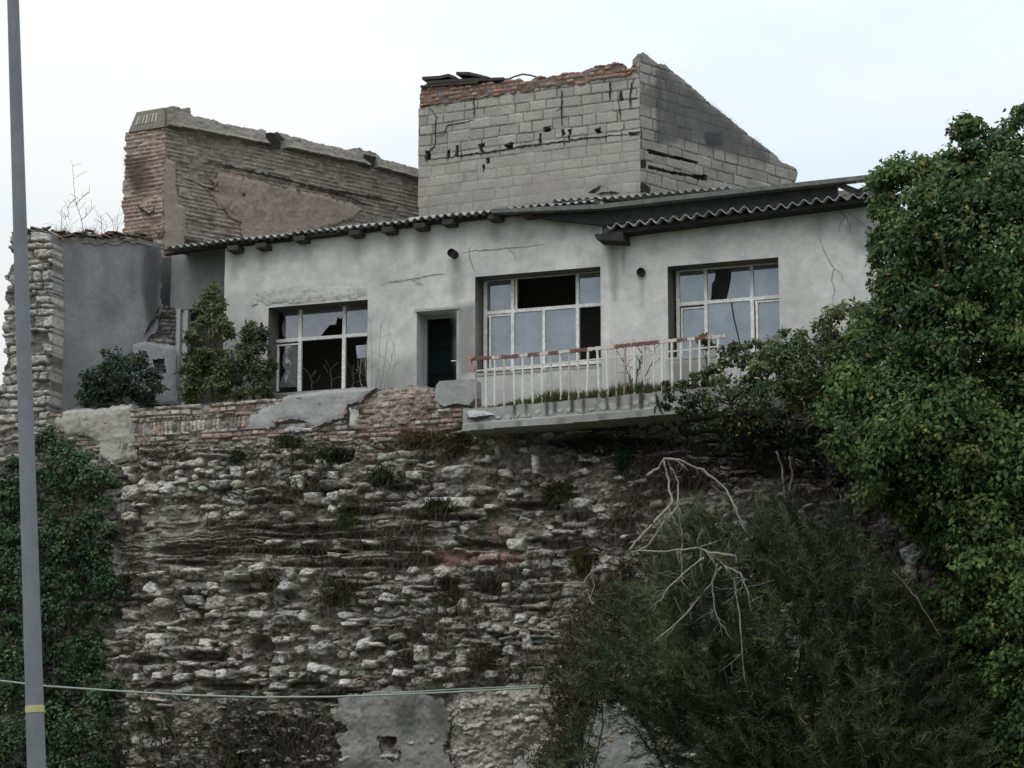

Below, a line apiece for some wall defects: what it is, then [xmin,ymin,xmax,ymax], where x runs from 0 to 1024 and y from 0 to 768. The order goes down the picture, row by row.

hole [266,132,281,150]
crack [426,77,642,163]
flaking render [209,170,362,238]
crack [463,244,544,271]
crack [820,210,871,301]
flaking render [55,404,139,465]
flaking render [245,385,432,435]